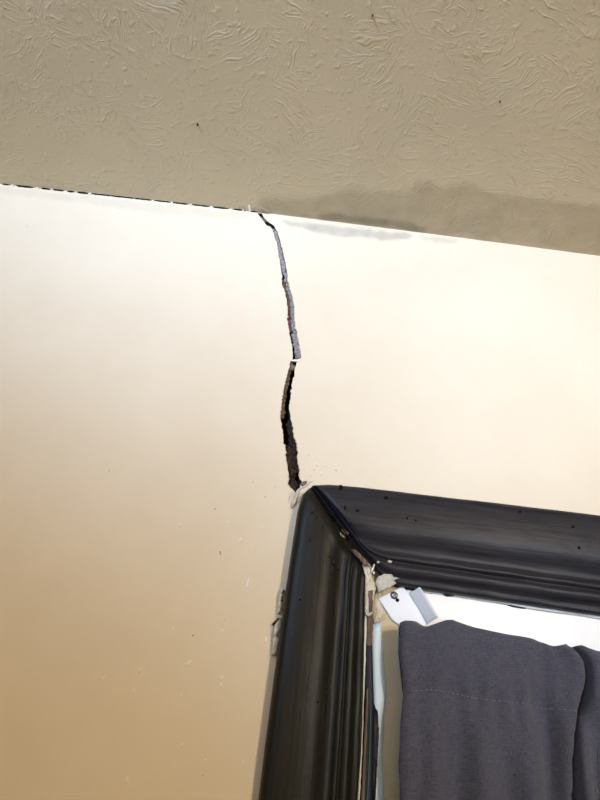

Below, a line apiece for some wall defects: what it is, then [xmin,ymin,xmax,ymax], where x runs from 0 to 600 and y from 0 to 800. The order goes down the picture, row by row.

crack [3,184,373,567]